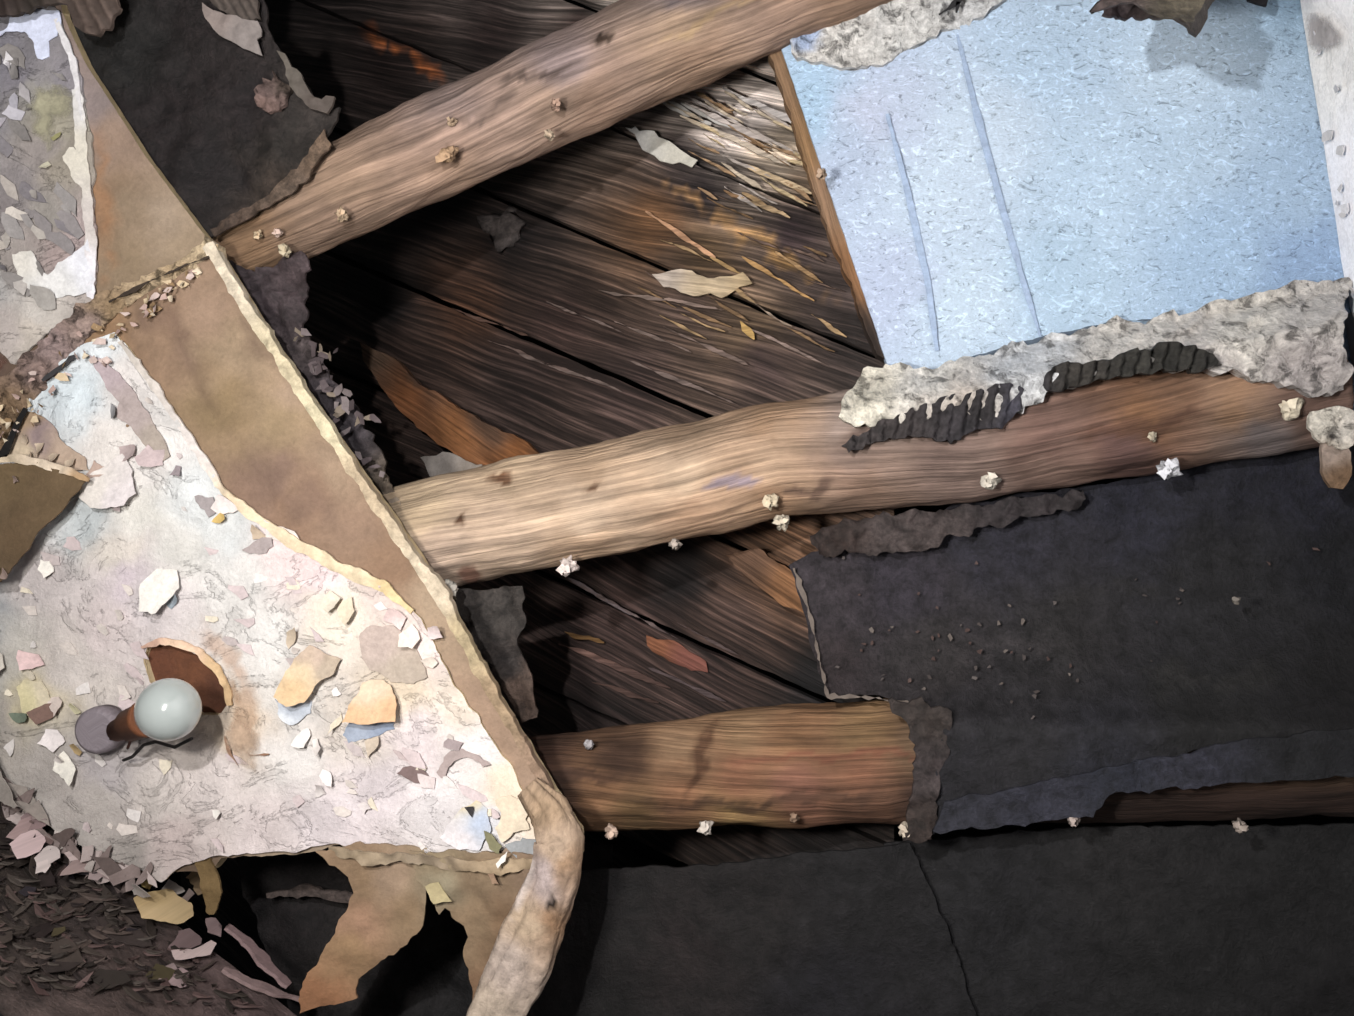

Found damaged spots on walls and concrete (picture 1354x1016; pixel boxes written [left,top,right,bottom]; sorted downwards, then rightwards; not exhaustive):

spalling [790,0,1007,71]
peeling [0,9,98,310]
peeling [626,127,698,168]
peeling [293,327,382,437]
spalling [838,277,1354,428]
peeling [0,355,182,582]
peeling [762,495,789,525]
peeling [1157,459,1179,480]
peeling [96,568,179,636]
peeling [0,641,106,786]
peeling [273,577,536,858]
peeling [0,771,263,1014]